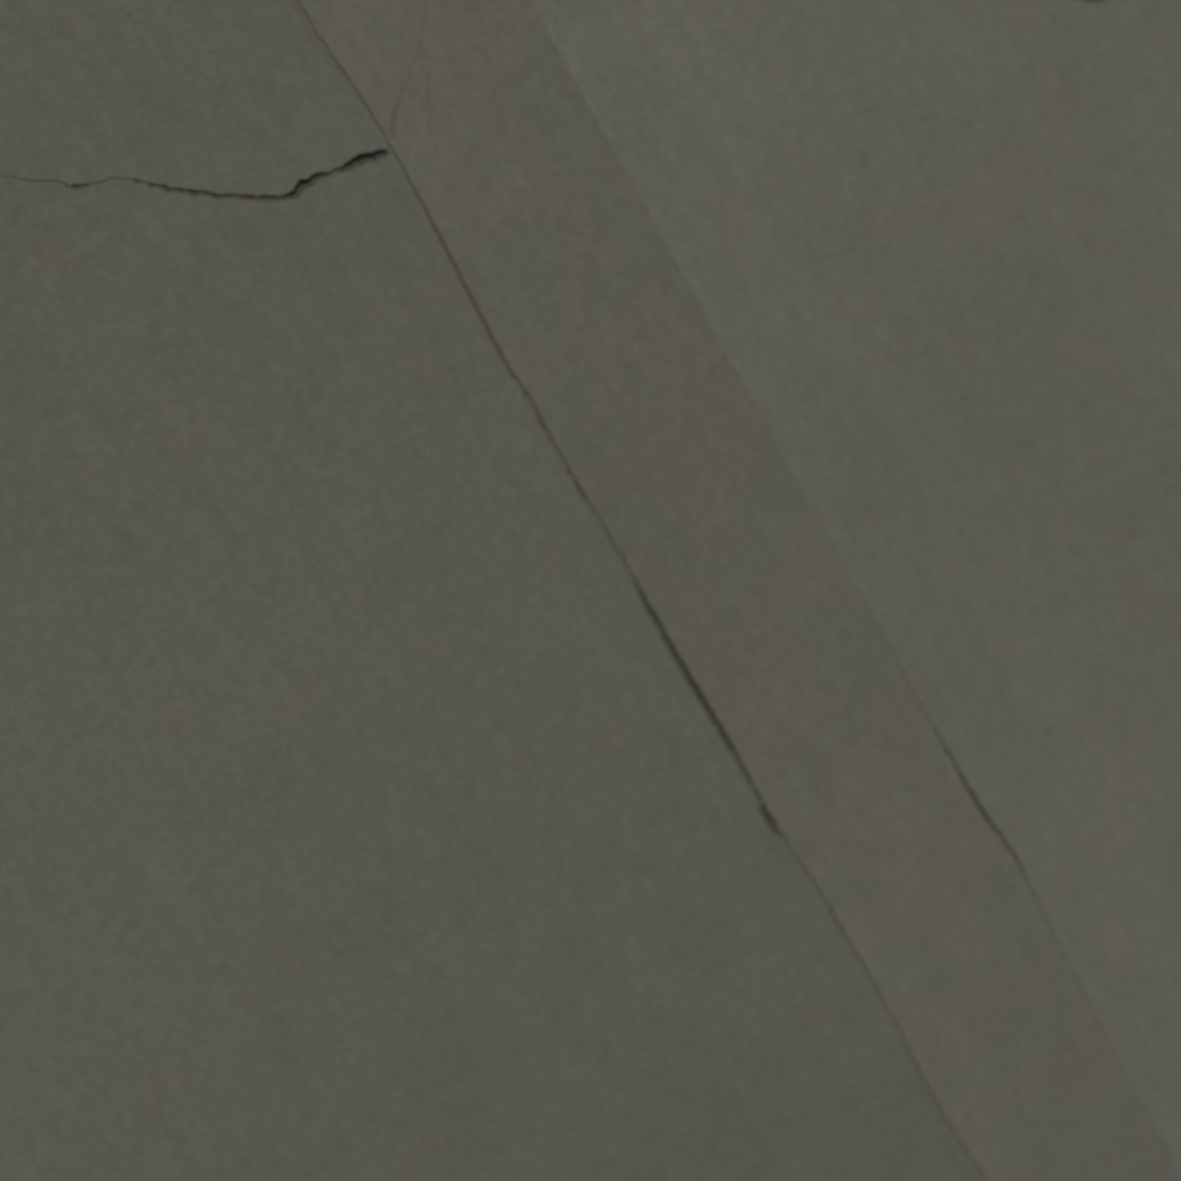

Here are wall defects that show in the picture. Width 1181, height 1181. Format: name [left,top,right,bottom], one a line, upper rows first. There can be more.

crack [0,149,389,202]
crack [290,0,988,1181]